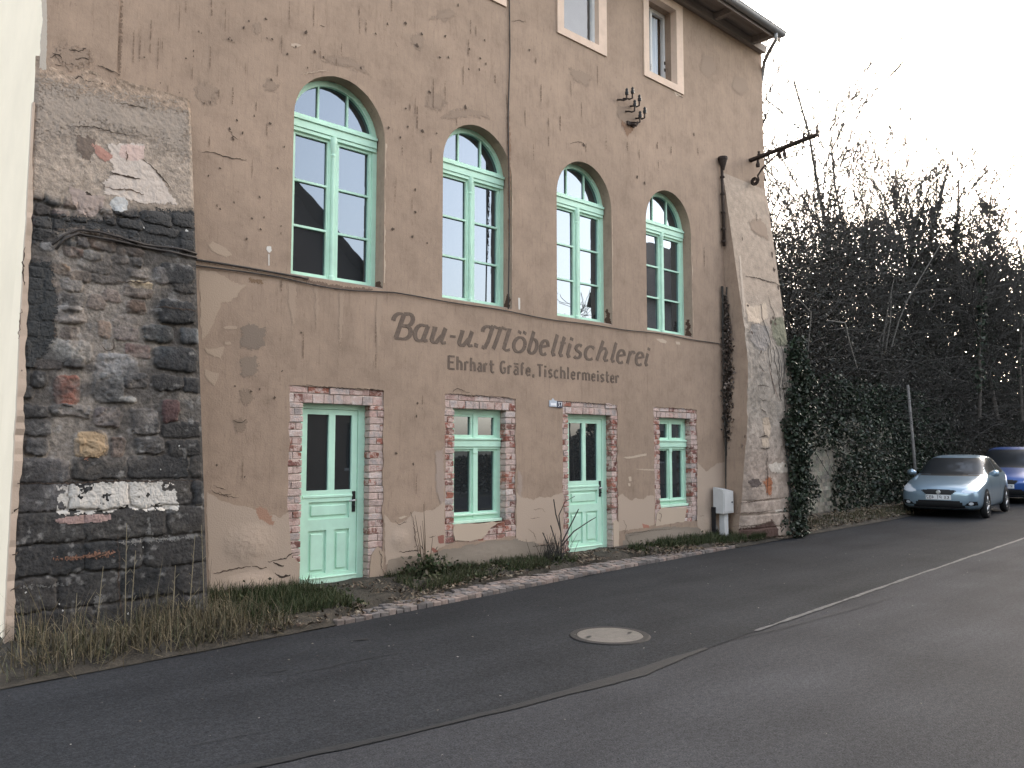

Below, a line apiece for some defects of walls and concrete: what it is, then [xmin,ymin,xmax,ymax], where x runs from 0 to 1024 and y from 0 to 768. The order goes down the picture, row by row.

spalling [68,141,177,217]
peeling [55,469,179,524]
peeling [206,492,300,595]
crack [214,552,298,578]
peeling [369,501,501,577]
peeling [516,493,564,553]
peeling [613,453,724,547]